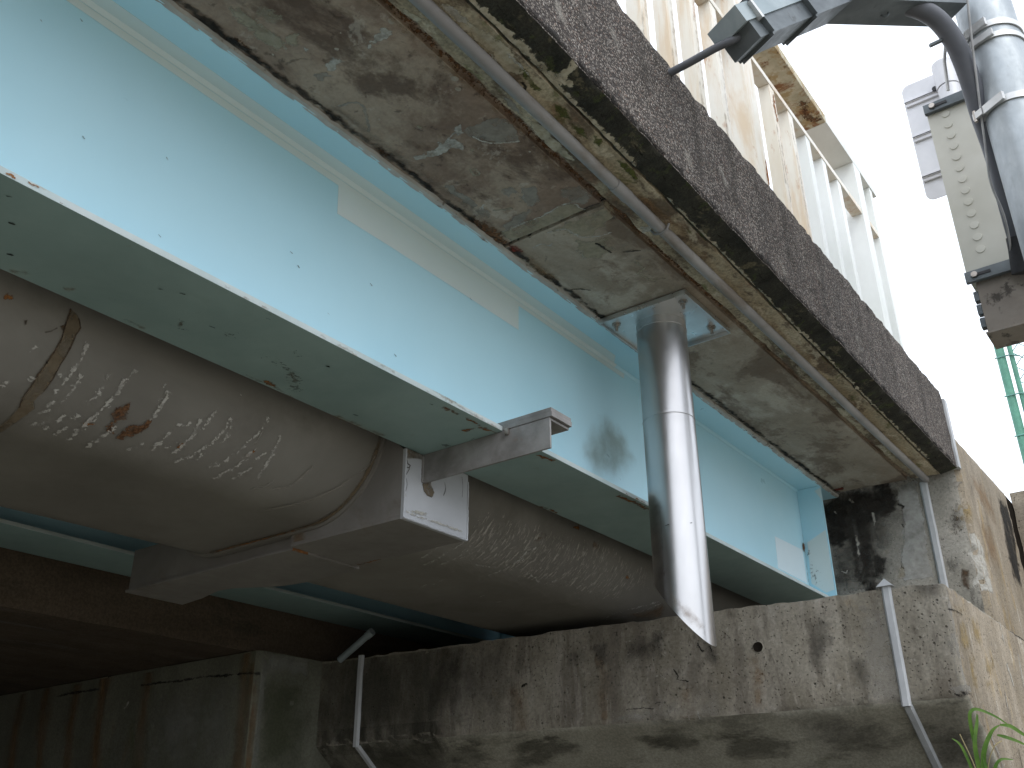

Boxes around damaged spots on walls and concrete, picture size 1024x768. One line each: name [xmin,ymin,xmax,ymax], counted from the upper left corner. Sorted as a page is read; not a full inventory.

damp [174,0,370,141]
peeling [440,0,635,166]
corrosion [799,101,821,122]
damp [382,124,615,318]
peeling [31,341,138,440]
corrosion [83,403,152,440]
peeling [126,410,281,480]
damp [691,381,897,591]
peeling [667,197,929,459]
damp [1000,501,1021,584]